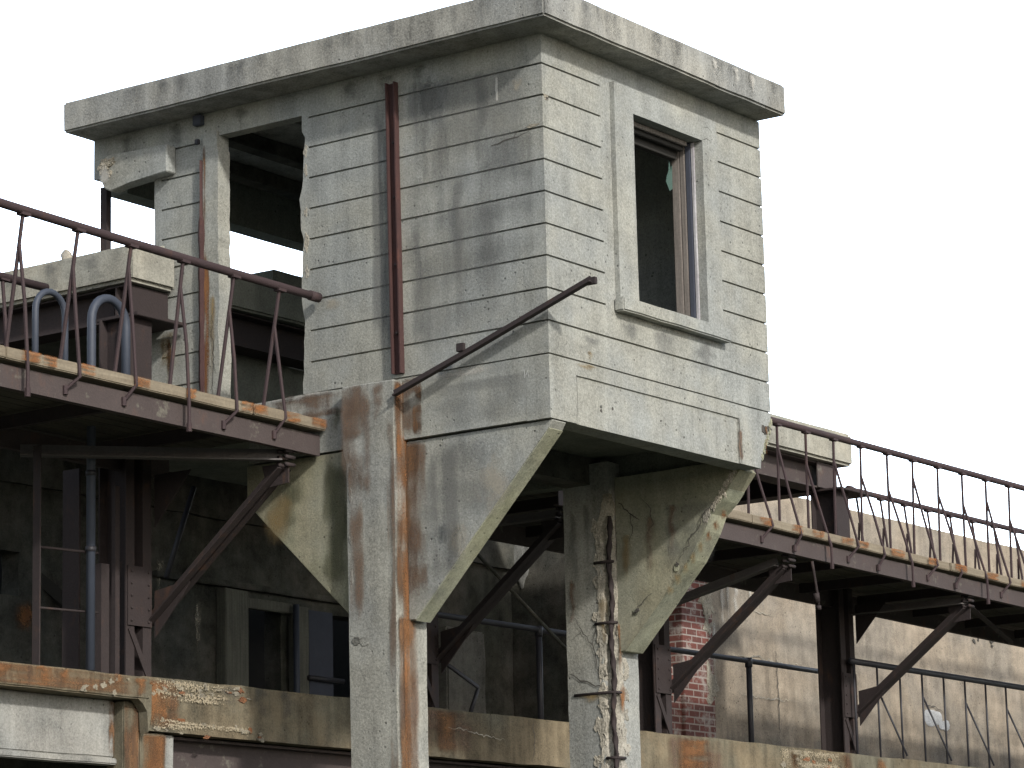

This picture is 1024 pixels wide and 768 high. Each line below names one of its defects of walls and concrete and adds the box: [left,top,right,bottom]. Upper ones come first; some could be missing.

corrosion [242,385,381,491]
corrosion [351,511,363,606]
spalling [574,493,631,768]
corrosion [0,662,178,768]
peeling [152,680,252,705]
peeling [153,716,265,743]
peeling [779,748,840,768]